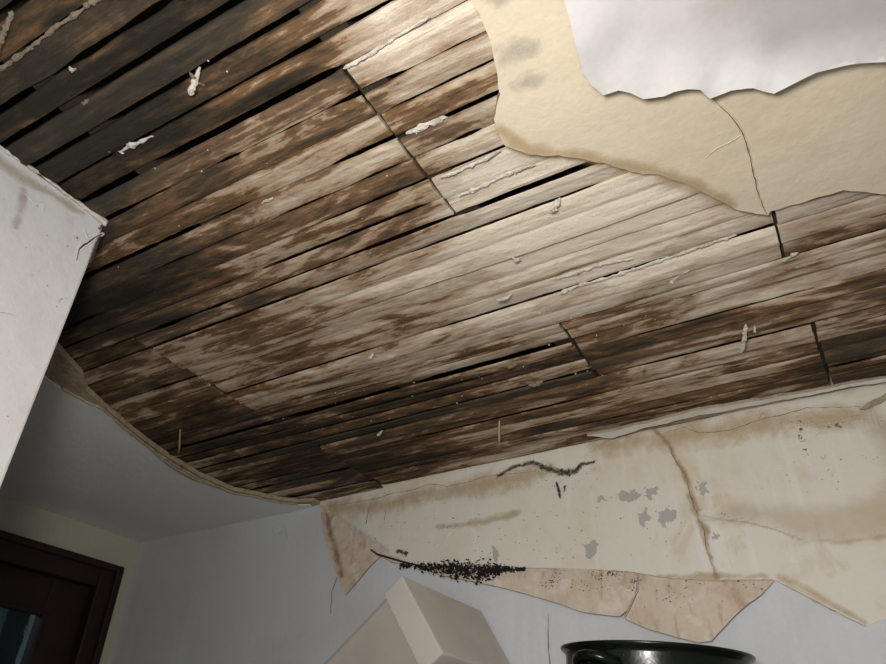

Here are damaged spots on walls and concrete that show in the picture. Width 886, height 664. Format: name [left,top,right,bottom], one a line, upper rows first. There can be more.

flaking render [471,0,886,215]
crack [706,98,767,216]
crack [75,227,105,260]
leakage [499,460,595,498]
peeling [318,382,886,627]
crack [655,406,860,575]